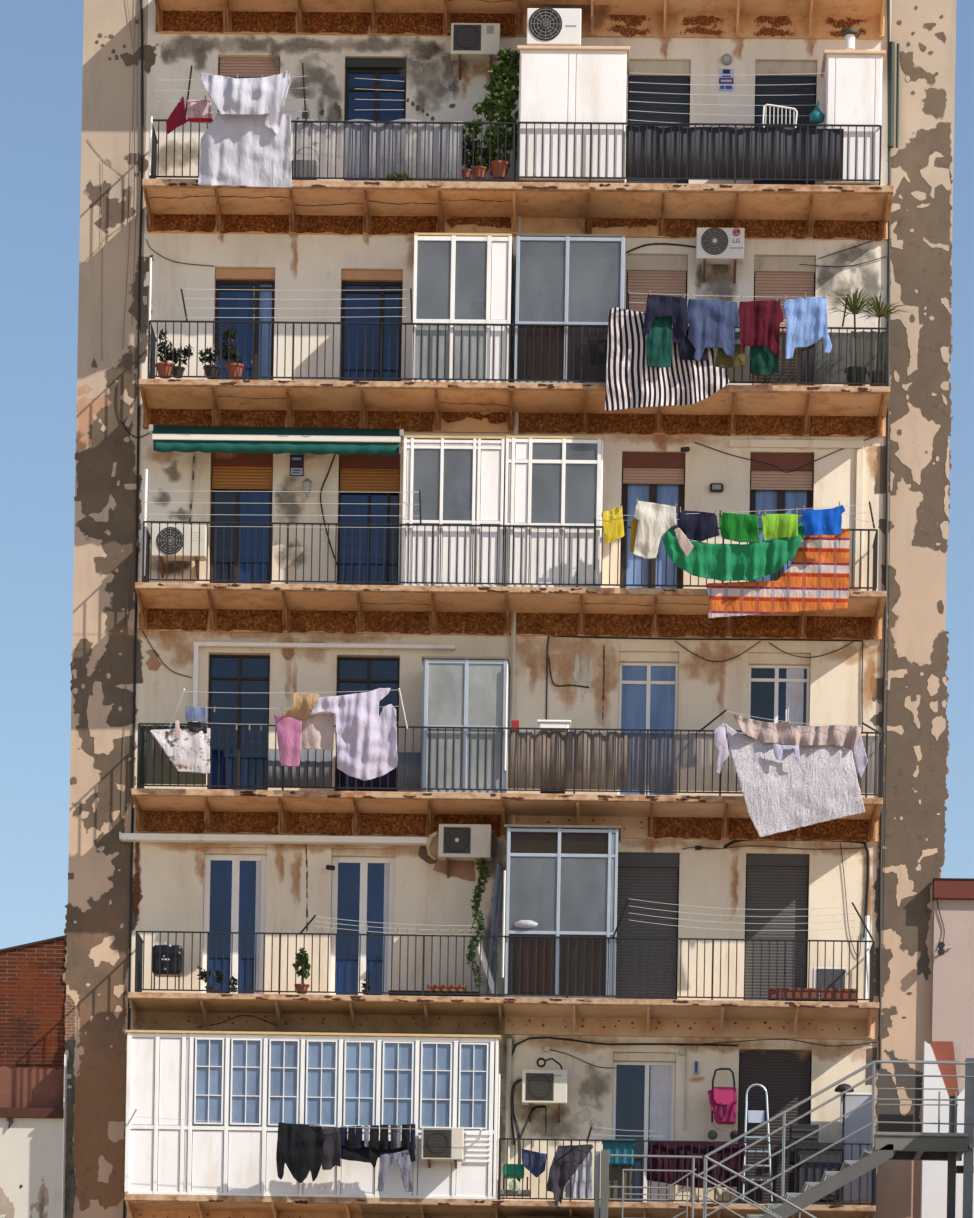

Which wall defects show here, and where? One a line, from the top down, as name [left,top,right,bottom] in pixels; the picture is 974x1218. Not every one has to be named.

leakage [162,36,218,69]
leakage [238,38,332,66]
spalling [95,10,516,74]
leakage [291,68,341,127]
leakage [355,35,463,110]
peeling [83,152,511,235]
peeling [518,15,954,553]
leakage [573,653,594,696]
peeling [62,255,874,1218]
peeling [654,565,950,1132]
peeling [0,1187,15,1218]
peeling [30,1178,49,1218]